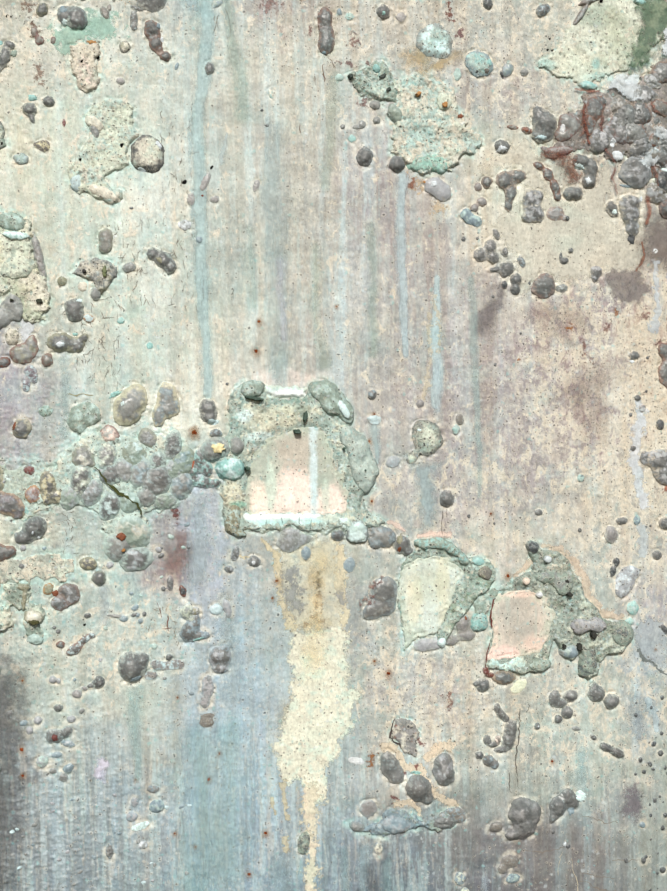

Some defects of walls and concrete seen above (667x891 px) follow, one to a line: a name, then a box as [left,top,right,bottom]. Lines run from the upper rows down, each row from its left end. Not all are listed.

spalling [47,7,119,93]
peeling [538,0,667,91]
peeling [67,99,139,205]
peeling [0,210,51,324]
peeling [200,379,406,537]
peeling [397,531,634,694]
peeling [0,675,24,887]
leakage [261,534,361,891]
crack [509,705,530,792]